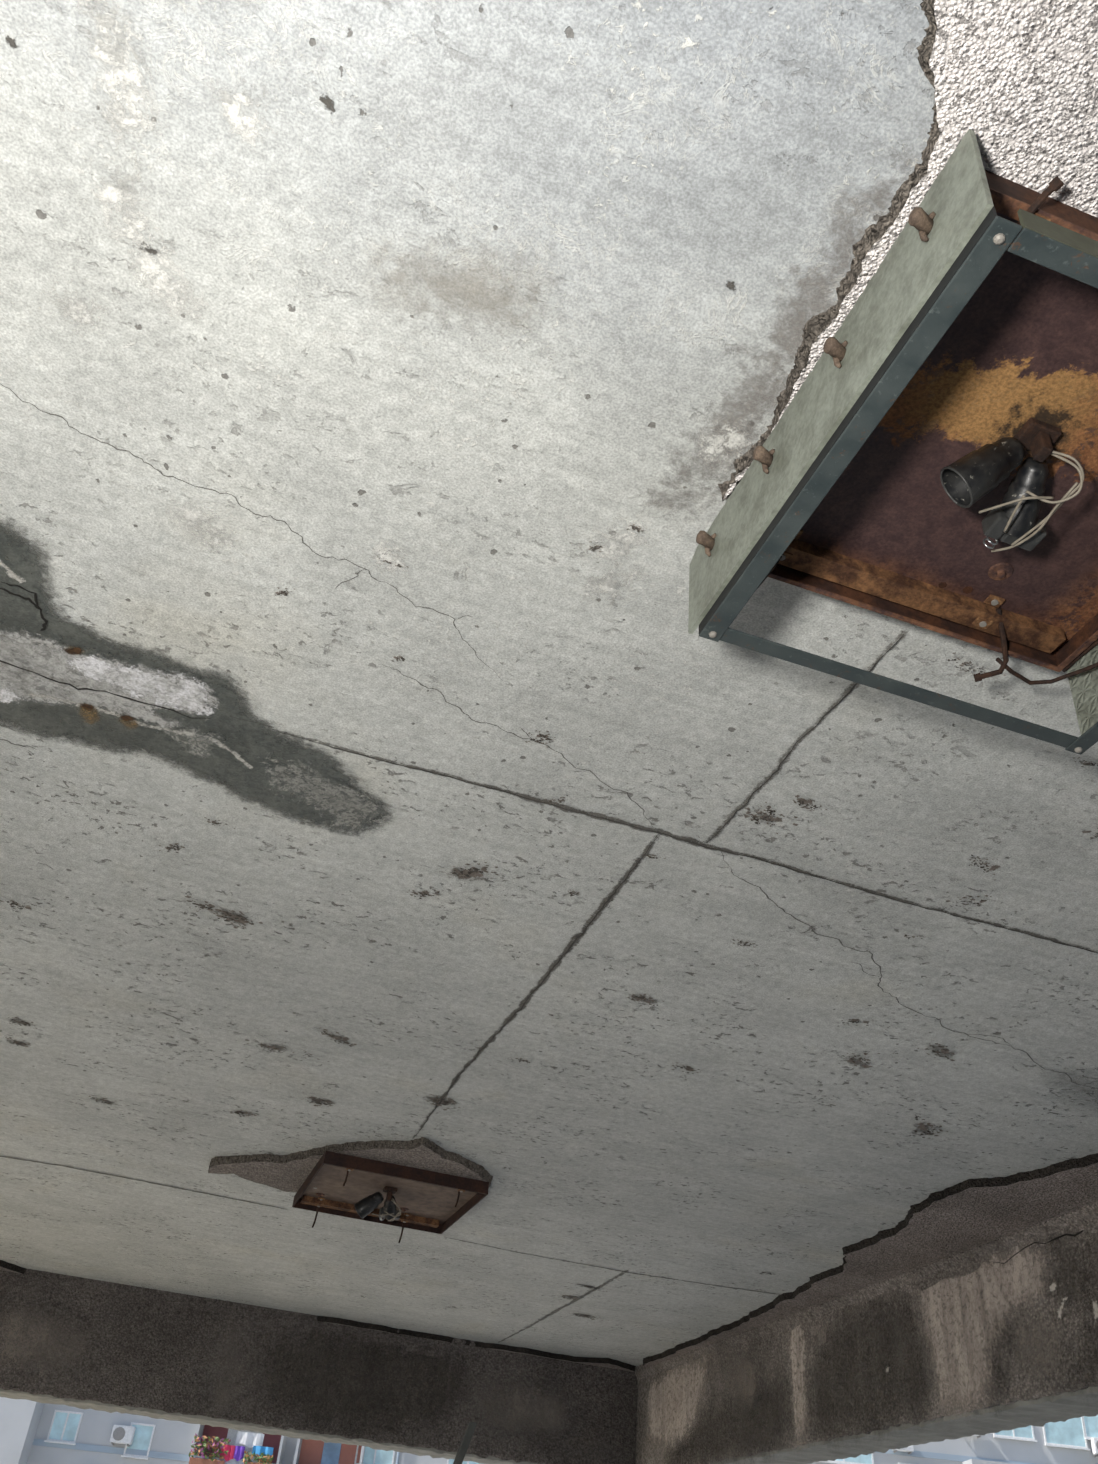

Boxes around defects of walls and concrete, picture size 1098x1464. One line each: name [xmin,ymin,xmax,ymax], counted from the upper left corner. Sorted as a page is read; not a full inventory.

spalling [718,0,940,502]
crack [0,384,502,680]
leakage [374,542,406,571]
crack [0,660,211,719]
leakage [0,523,388,834]
crack [382,664,656,829]
crack [721,852,1098,1089]
spalling [0,1260,27,1274]
spalling [208,1137,493,1187]
spalling [307,1153,1098,1371]
leakage [648,1233,1098,1464]